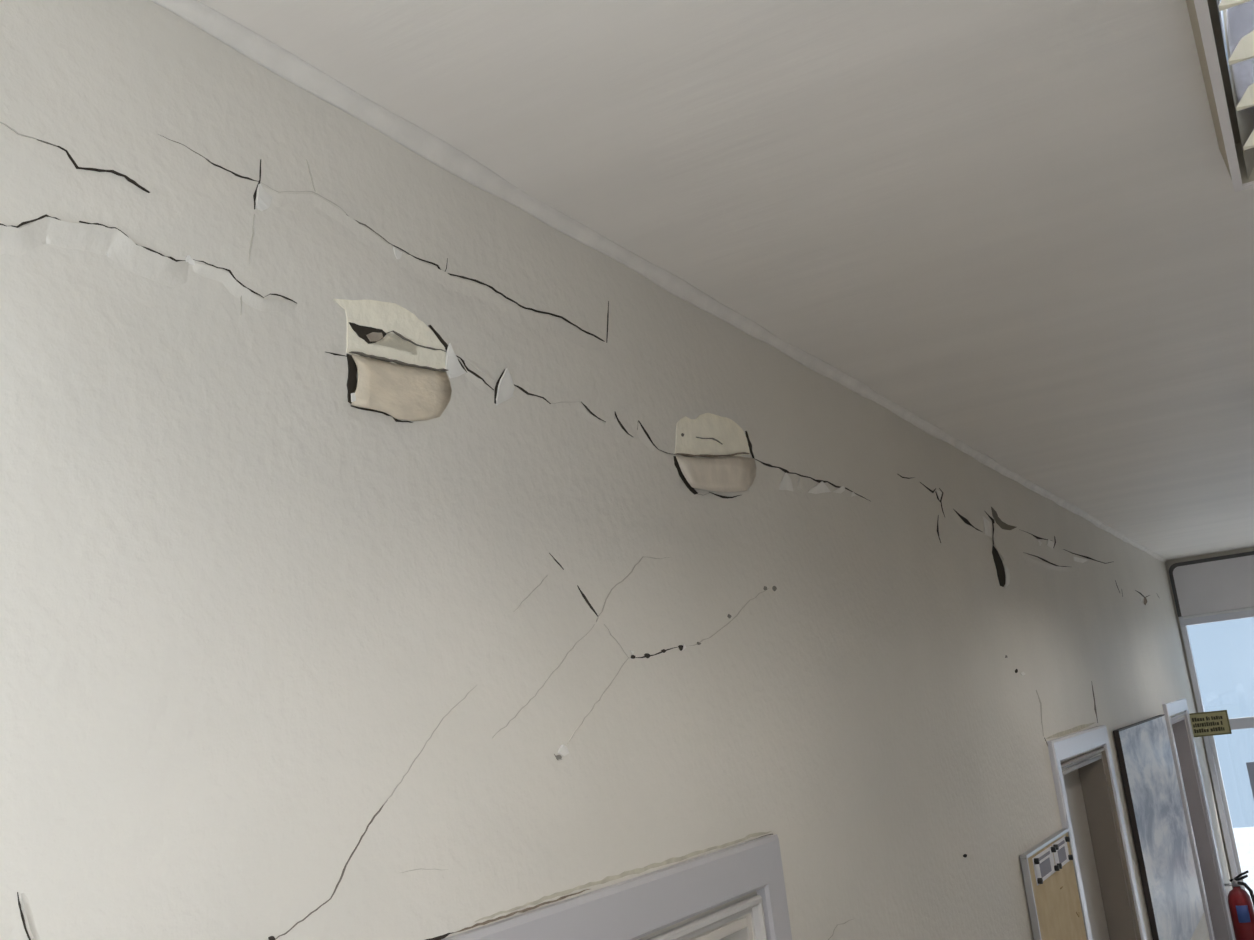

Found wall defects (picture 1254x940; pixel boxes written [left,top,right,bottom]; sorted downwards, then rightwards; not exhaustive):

crack [0,122,150,193]
peeling [326,299,452,423]
crack [445,343,675,455]
peeling [673,413,756,499]
crack [754,458,870,501]
crack [898,474,982,543]
crack [1019,529,1159,605]
crack [493,553,671,760]
crack [268,686,476,940]
crack [17,892,41,940]
crack [426,831,773,940]